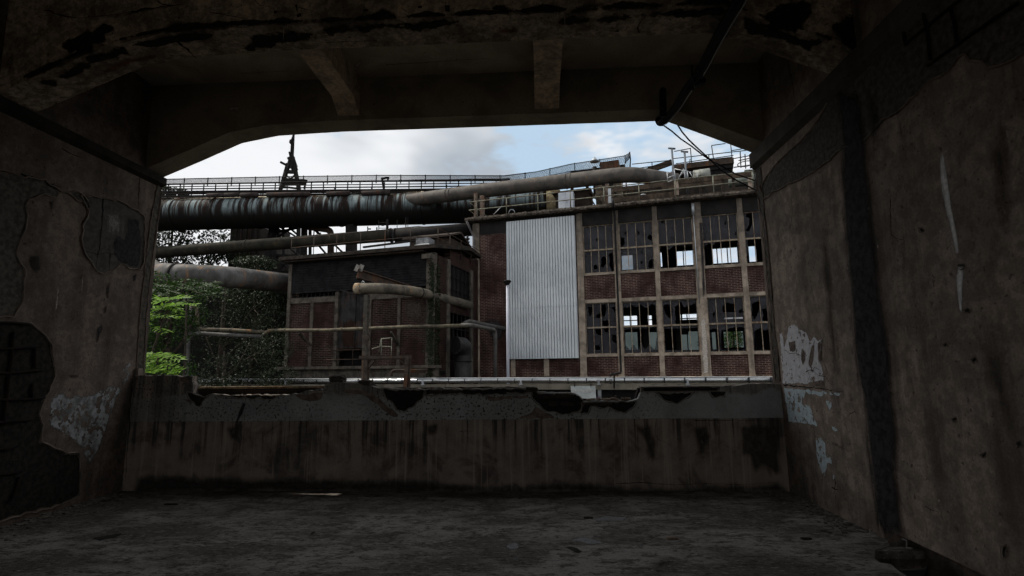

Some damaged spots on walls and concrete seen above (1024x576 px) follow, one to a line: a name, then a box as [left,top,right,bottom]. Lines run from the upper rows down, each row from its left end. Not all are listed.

flaking render [0,185,163,523]
flaking render [343,387,638,417]
peeling [753,165,840,479]